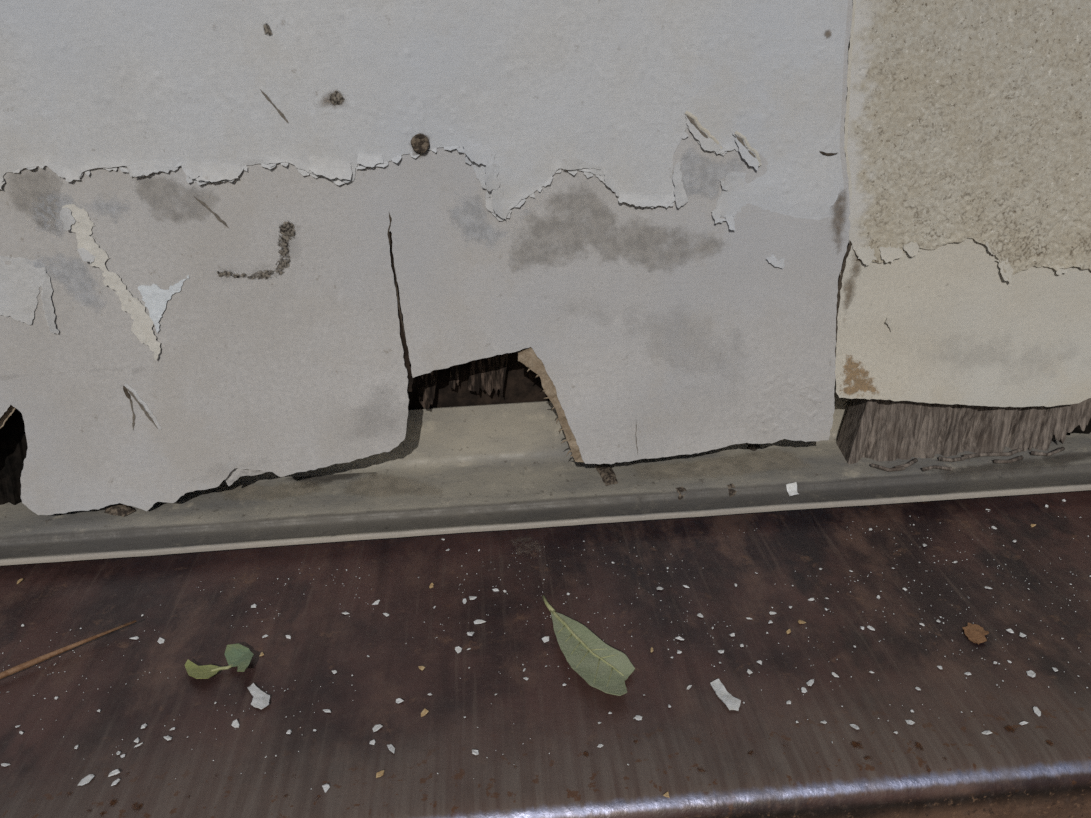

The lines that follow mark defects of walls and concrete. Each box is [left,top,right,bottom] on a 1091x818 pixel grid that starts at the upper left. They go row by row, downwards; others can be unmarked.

peeling [0,0,848,231]
peeling [0,256,59,334]
peeling [60,204,189,360]
spalling [217,222,295,279]
crack [387,213,414,392]
spalling [0,405,16,429]
spalling [518,347,584,462]
corrosion [844,357,876,395]